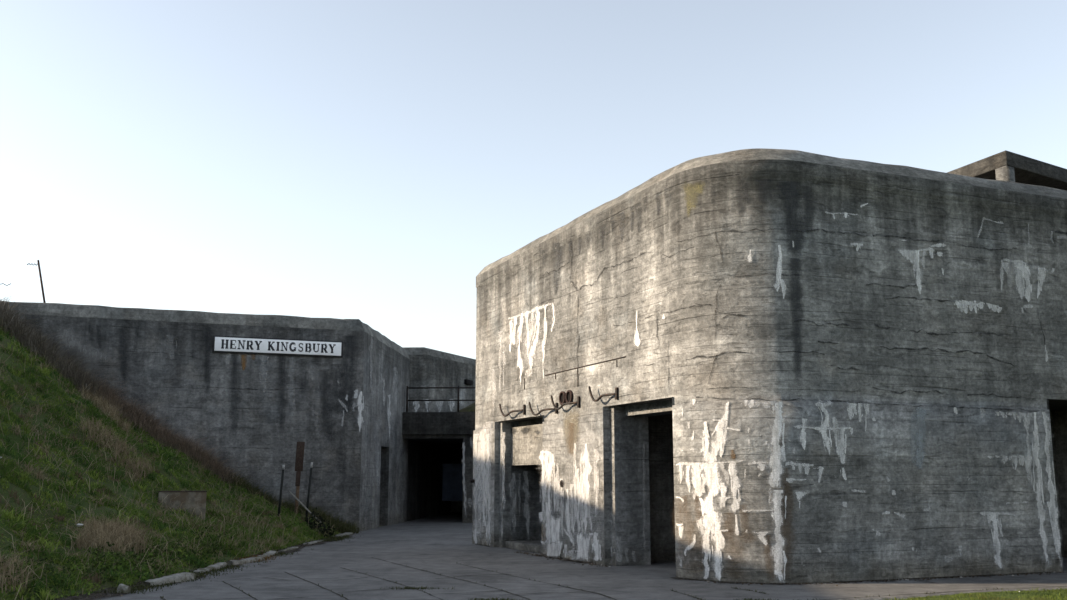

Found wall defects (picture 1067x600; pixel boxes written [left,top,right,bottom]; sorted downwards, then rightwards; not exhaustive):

damp [509,231,589,385]
damp [900,240,944,294]
damp [1003,260,1054,309]
damp [332,336,364,431]
damp [472,429,503,544]
damp [539,444,612,560]
damp [676,402,750,580]
damp [980,512,1003,568]
damp [1014,412,1061,561]